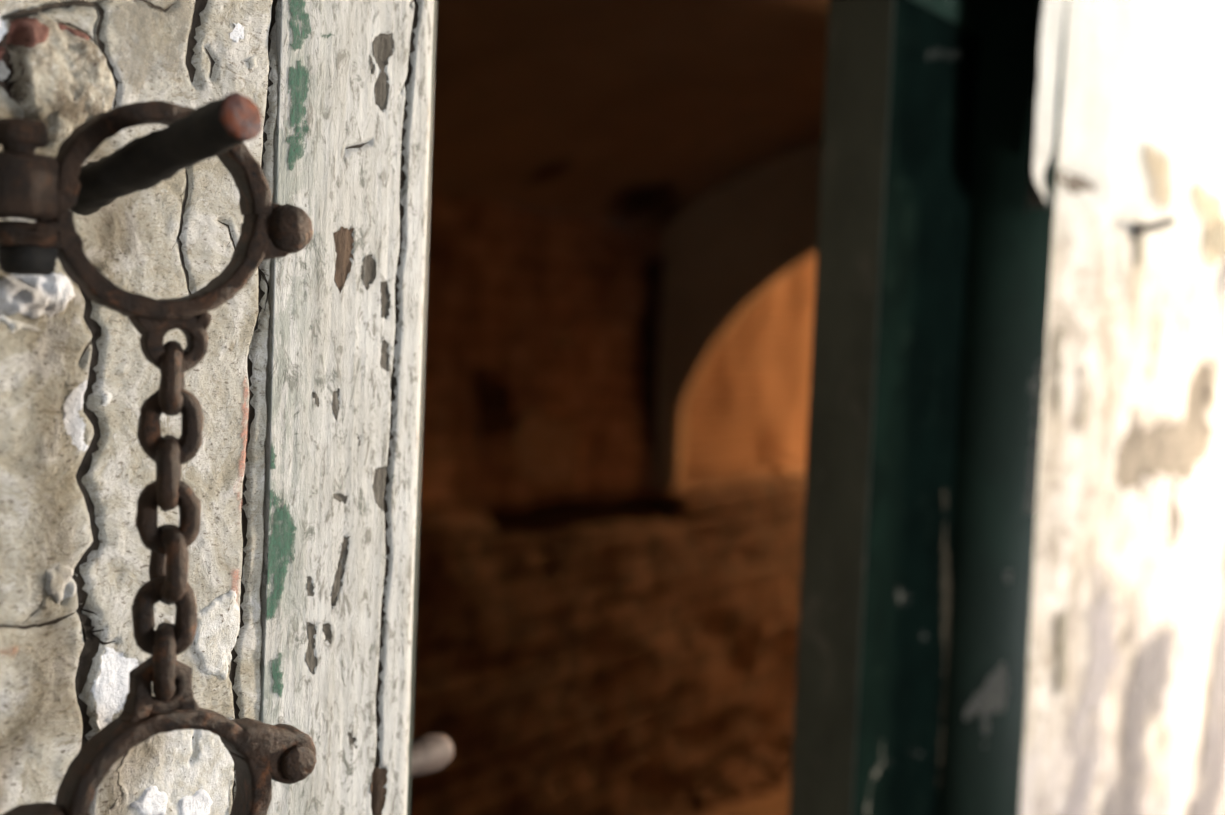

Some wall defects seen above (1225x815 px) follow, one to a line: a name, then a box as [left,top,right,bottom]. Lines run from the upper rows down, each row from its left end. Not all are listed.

flaking render [0,13,116,142]
crack [2,0,119,108]
crack [142,0,215,82]
crack [261,0,278,170]
peeling [370,31,394,112]
peeling [333,226,391,319]
corrosion [240,380,248,476]
crack [0,289,115,747]
crack [228,267,269,719]
flaking render [193,587,240,680]
peeling [305,535,350,674]
flaking render [90,646,138,730]